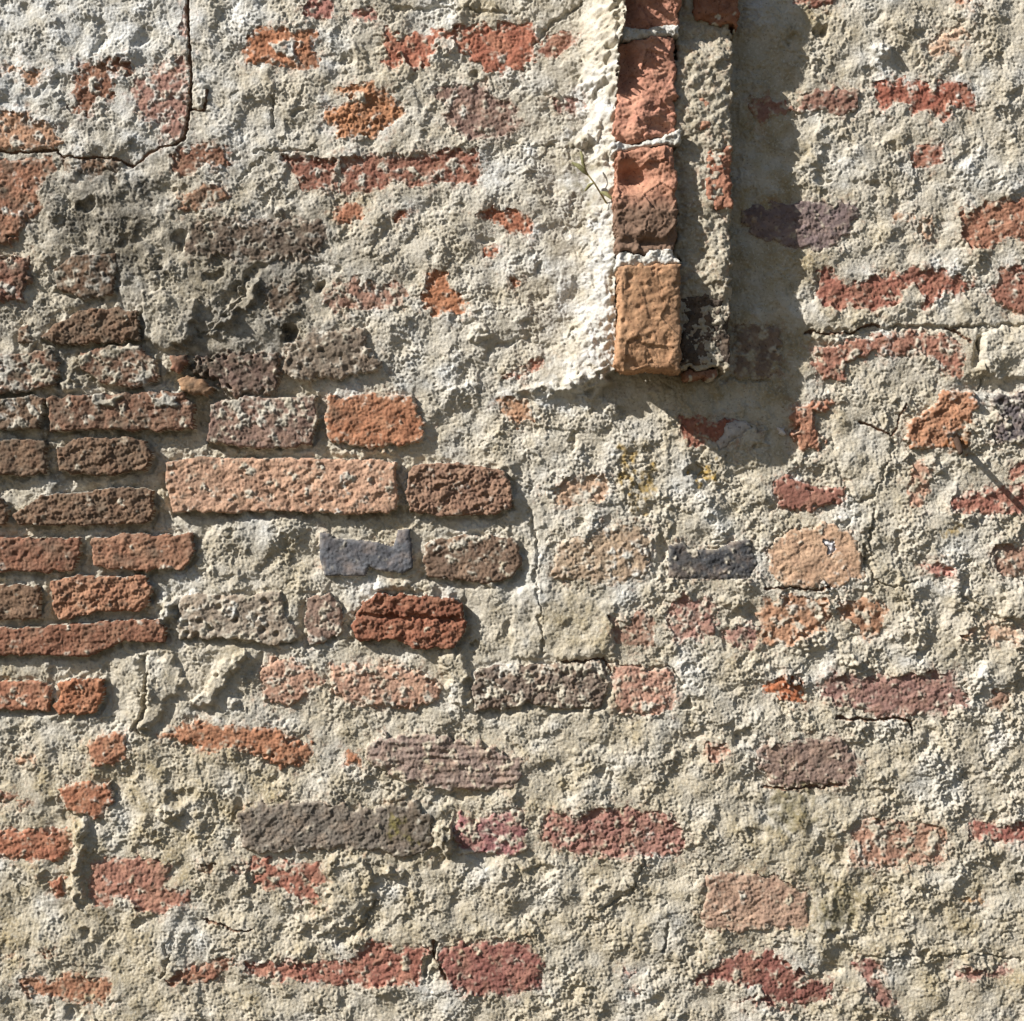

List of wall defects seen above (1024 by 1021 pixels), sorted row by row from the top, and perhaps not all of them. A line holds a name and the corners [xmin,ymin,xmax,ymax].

crack [0,0,209,169]
crack [804,322,880,336]
crack [944,327,973,343]
spalling [502,356,545,380]
spalling [494,395,535,431]
spalling [0,253,522,716]
spalling [471,660,677,716]
crack [835,715,913,732]